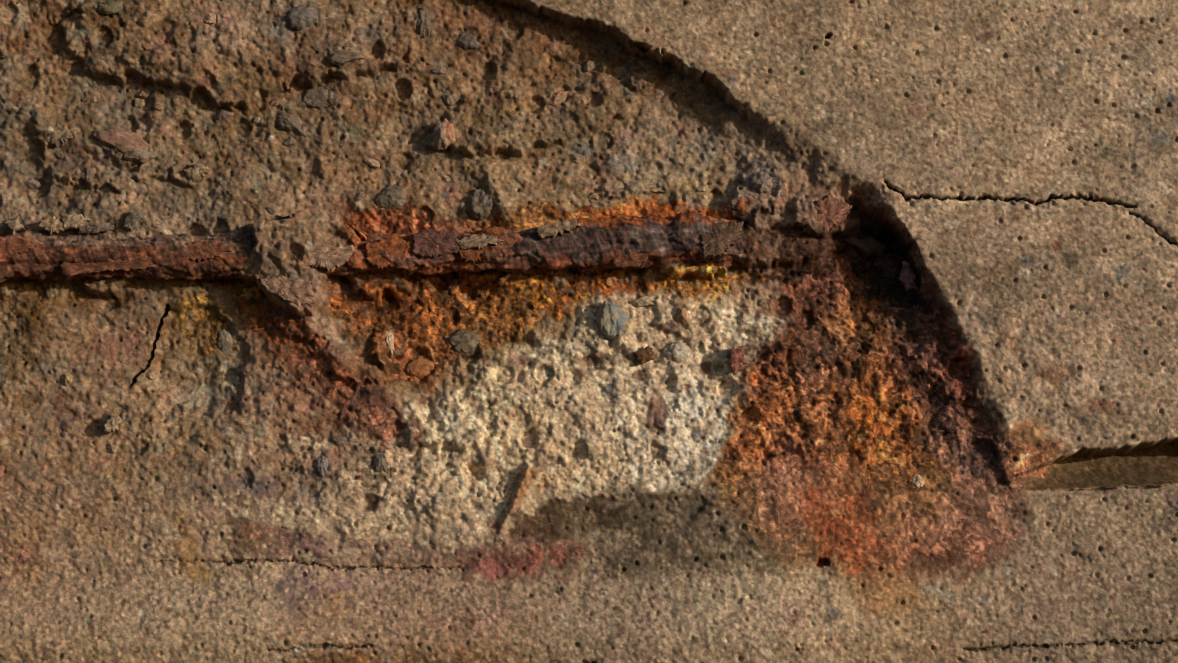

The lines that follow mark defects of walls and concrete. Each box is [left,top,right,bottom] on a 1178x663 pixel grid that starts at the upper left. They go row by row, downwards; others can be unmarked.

crack [133,306,170,383]
spalling [0,0,936,547]
corrosion [170,197,1065,612]
crack [884,181,1178,247]